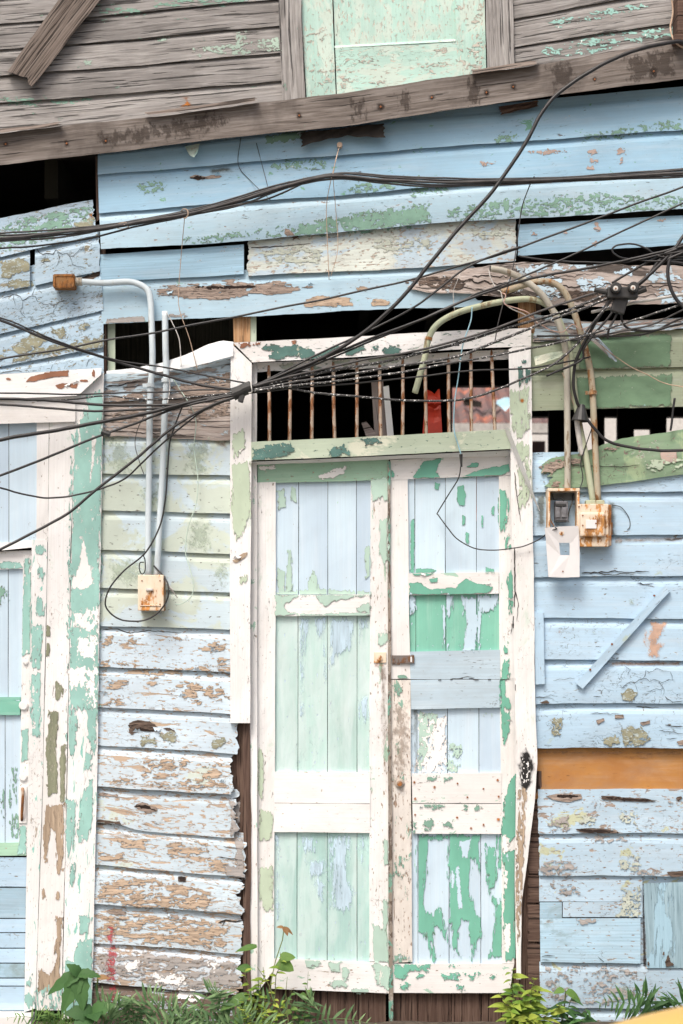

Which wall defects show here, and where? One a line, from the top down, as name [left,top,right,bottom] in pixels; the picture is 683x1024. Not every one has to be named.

peeling [0,205,95,289]
spalling [195,280,270,290]
peeling [447,192,683,246]
peeling [0,316,145,380]
peeling [229,428,297,541]
peeling [0,369,230,887]
crack [593,666,683,739]
peeling [393,711,463,783]
peeling [163,800,246,881]
peeling [302,758,531,995]
peeling [541,797,650,843]
peeling [24,874,241,1012]